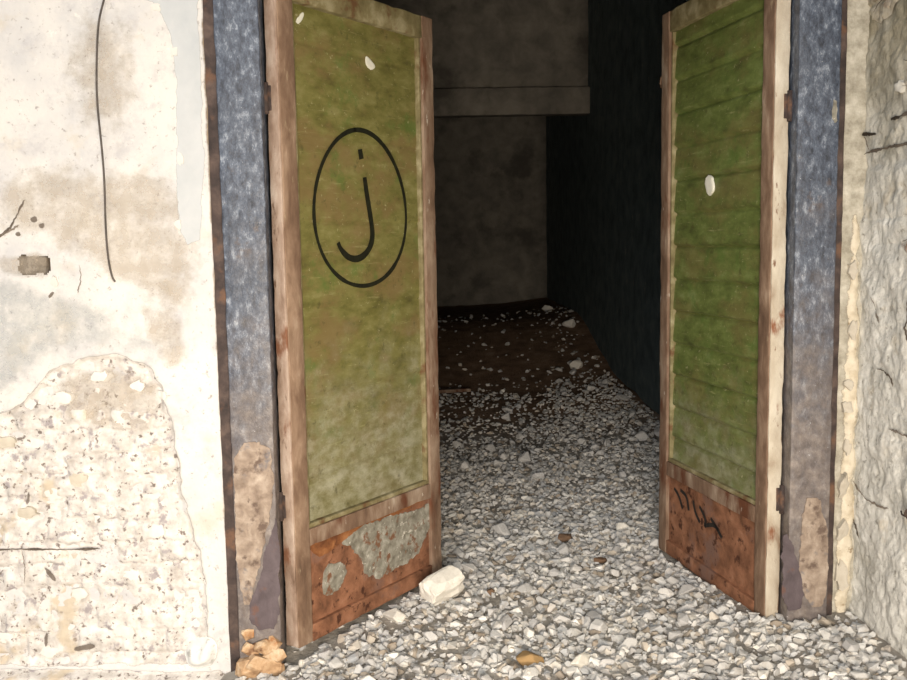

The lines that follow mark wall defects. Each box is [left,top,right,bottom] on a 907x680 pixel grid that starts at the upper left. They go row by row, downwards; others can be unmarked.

spalling [868,0,899,24]
peeling [149,0,205,245]
crack [0,200,24,237]
spalling [0,354,225,680]
peeling [233,441,275,605]
flaking render [799,215,860,613]
crack [853,481,889,509]